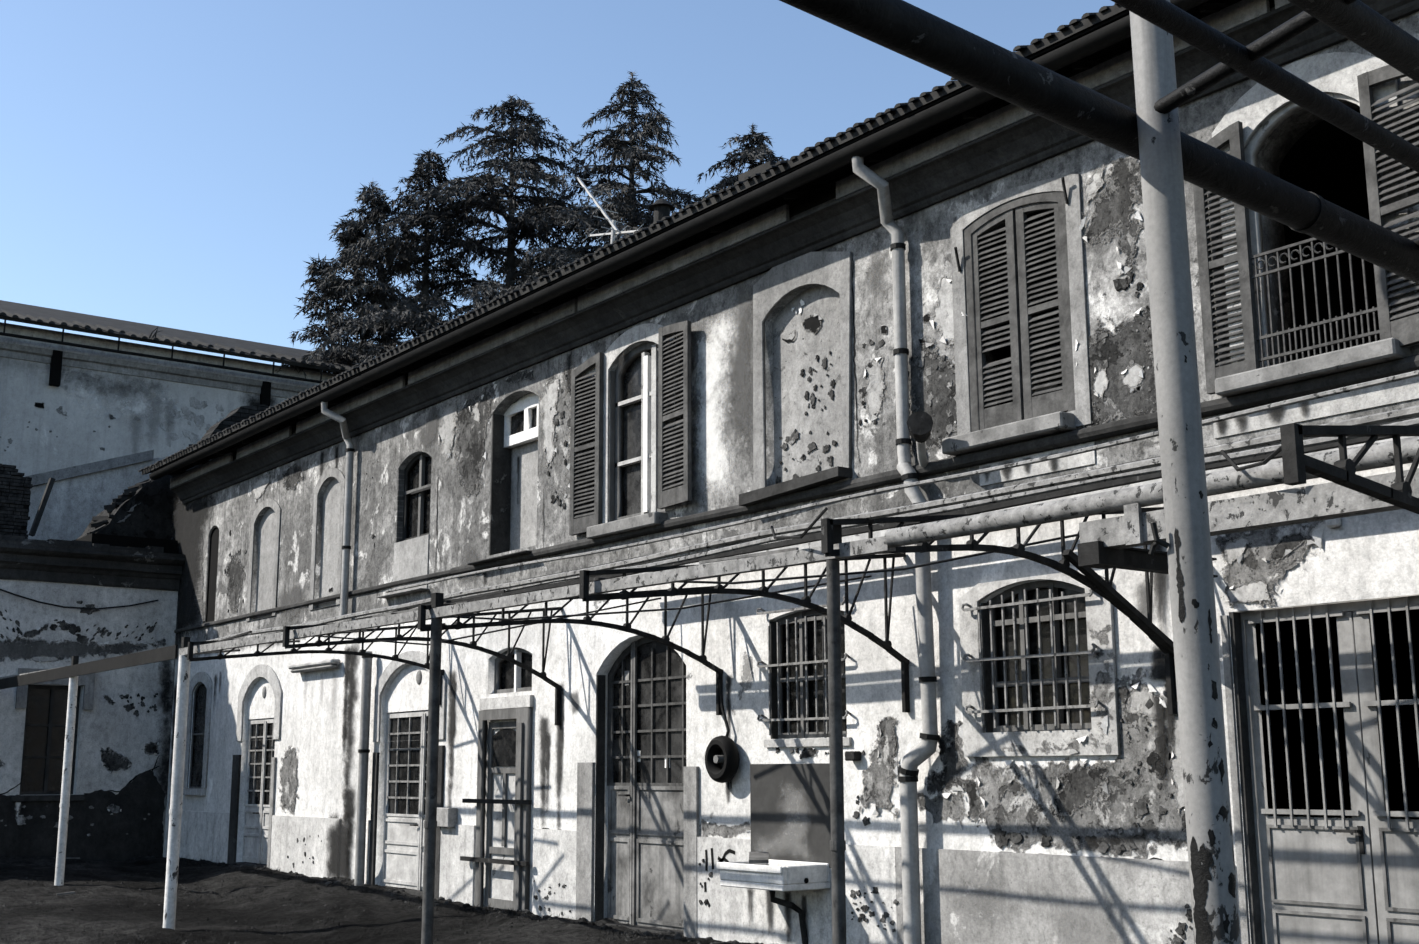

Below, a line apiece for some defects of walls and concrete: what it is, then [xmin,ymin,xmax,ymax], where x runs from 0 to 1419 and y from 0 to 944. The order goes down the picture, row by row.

peeling [1075,157,1157,433]
peeling [776,351,837,484]
peeling [858,275,970,457]
peeling [1215,520,1324,608]
peeling [0,601,166,662]
water stain [326,646,358,879]
peeling [853,716,899,826]
peeling [917,625,1236,944]
peeling [850,887,899,932]